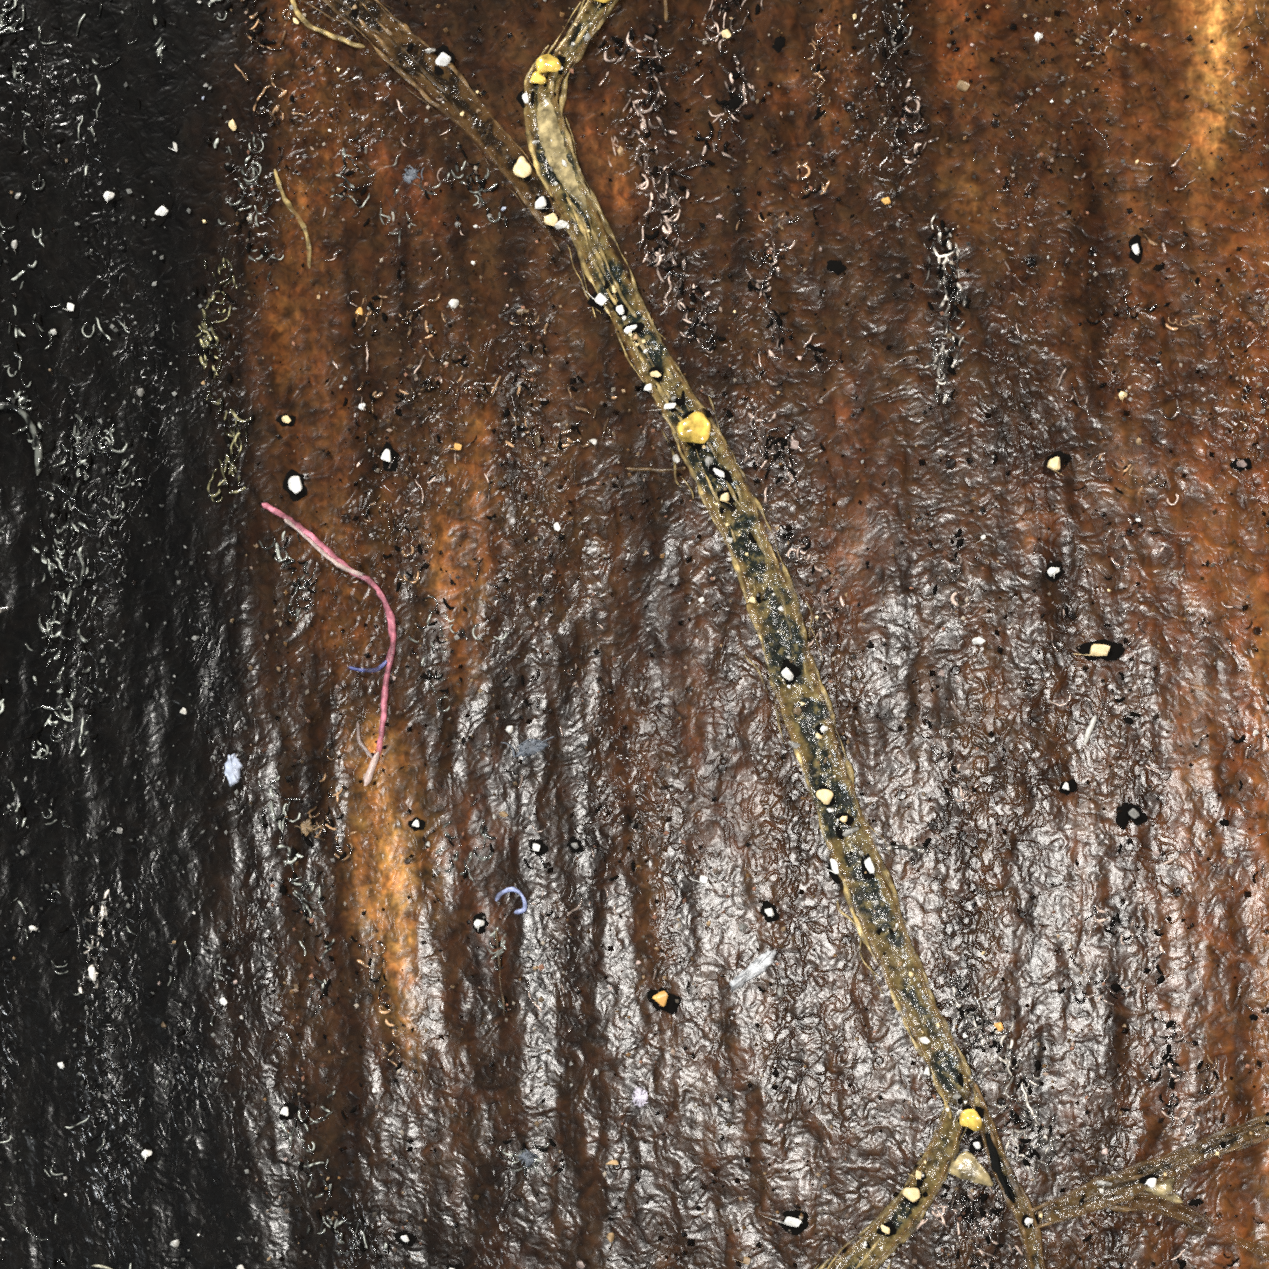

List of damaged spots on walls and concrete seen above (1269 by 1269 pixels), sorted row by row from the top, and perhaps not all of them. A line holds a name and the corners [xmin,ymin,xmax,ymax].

crack [300,0,1269,1269]